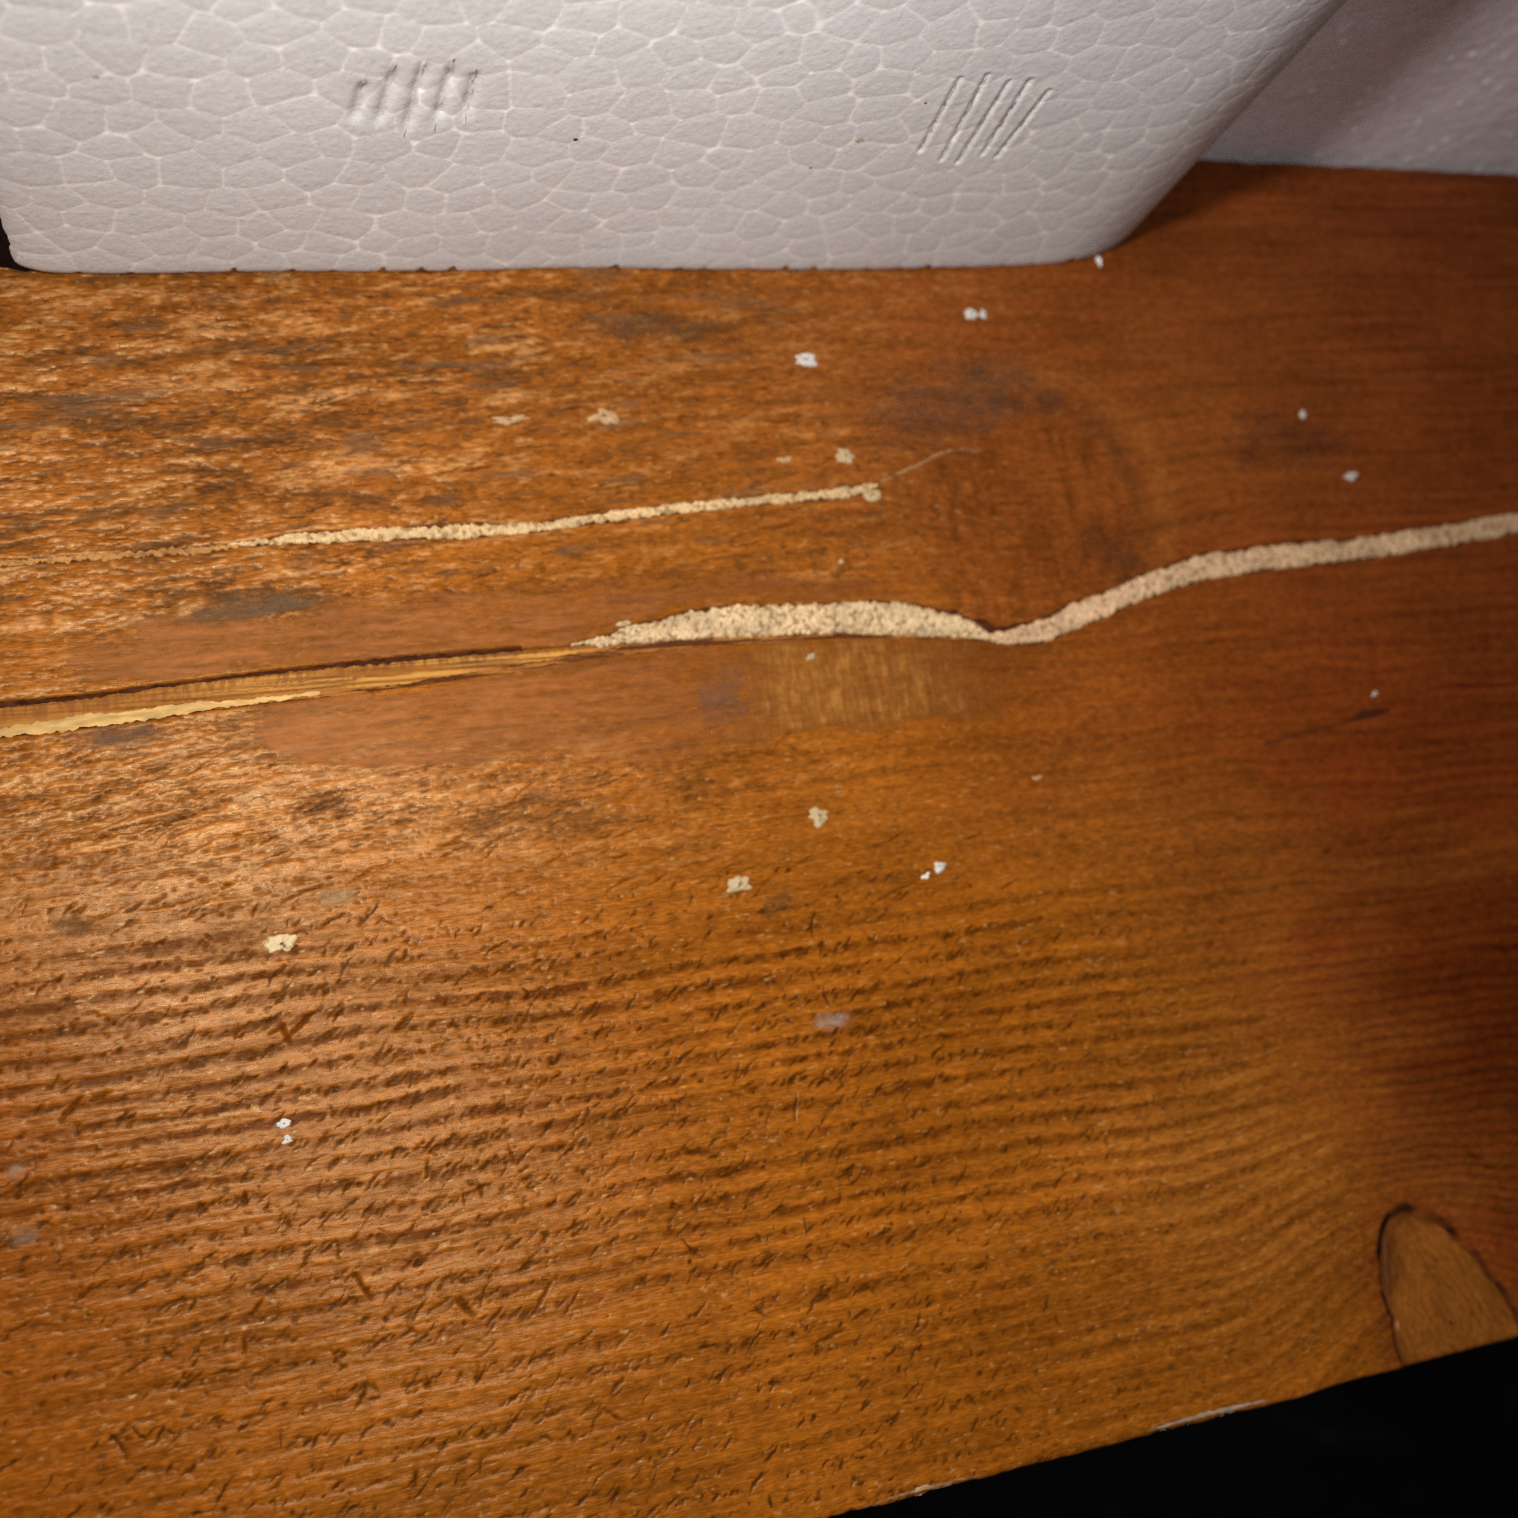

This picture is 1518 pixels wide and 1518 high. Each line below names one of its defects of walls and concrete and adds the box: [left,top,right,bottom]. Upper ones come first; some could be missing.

crack [0,448,979,567]
crack [0,513,1518,737]
crack [1265,709,1392,745]